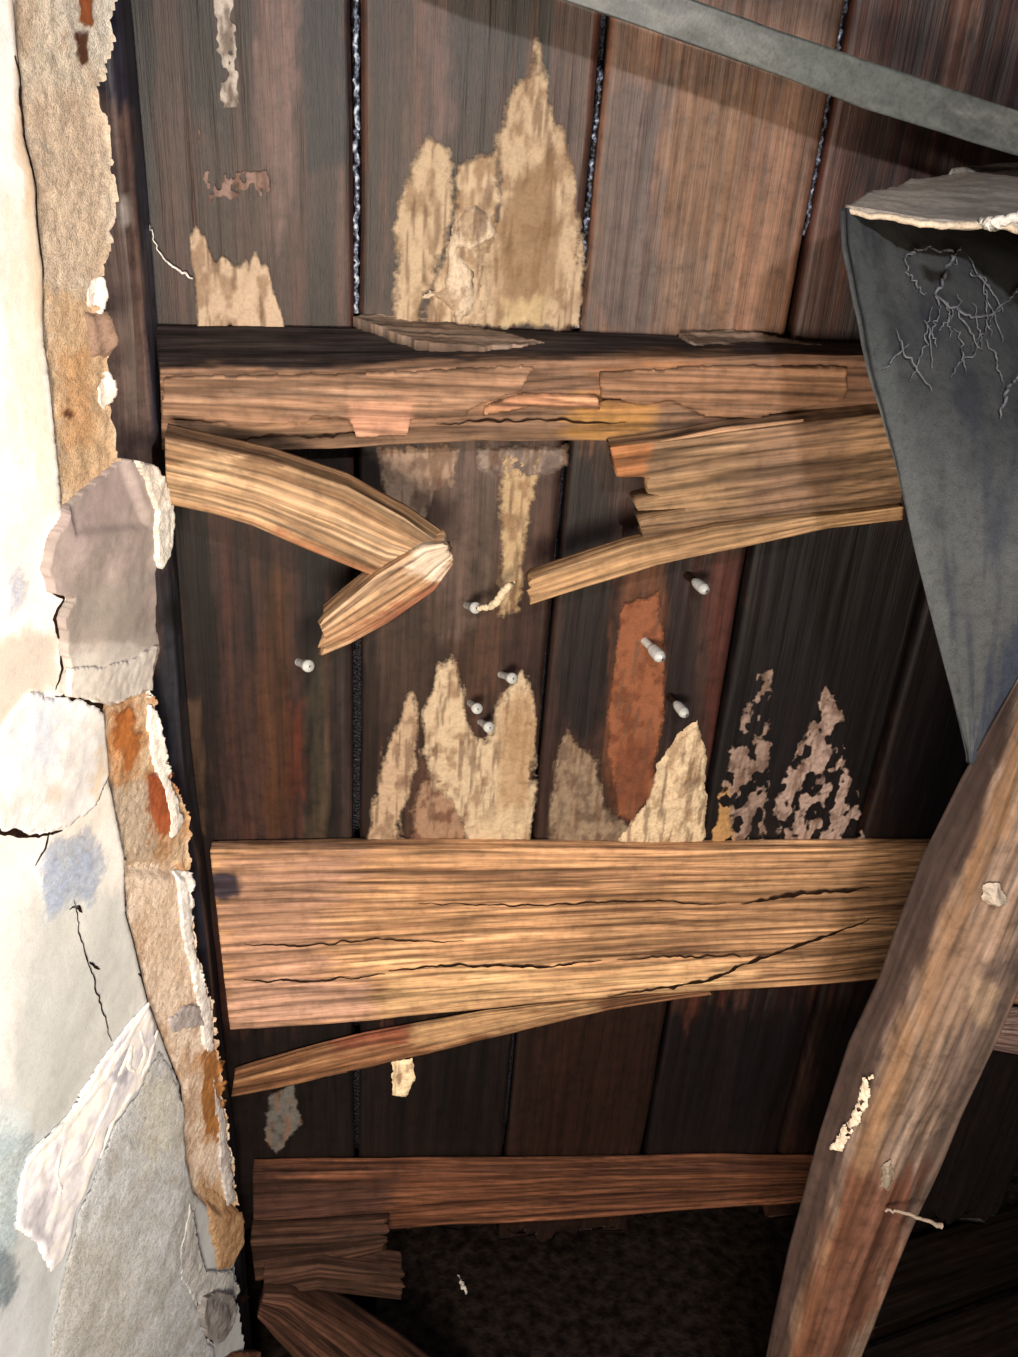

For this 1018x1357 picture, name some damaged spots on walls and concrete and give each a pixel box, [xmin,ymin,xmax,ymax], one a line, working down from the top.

rust [112,707,141,773]
flaking render [0,0,261,1357]
rust [146,774,172,838]
crack [69,901,112,1041]